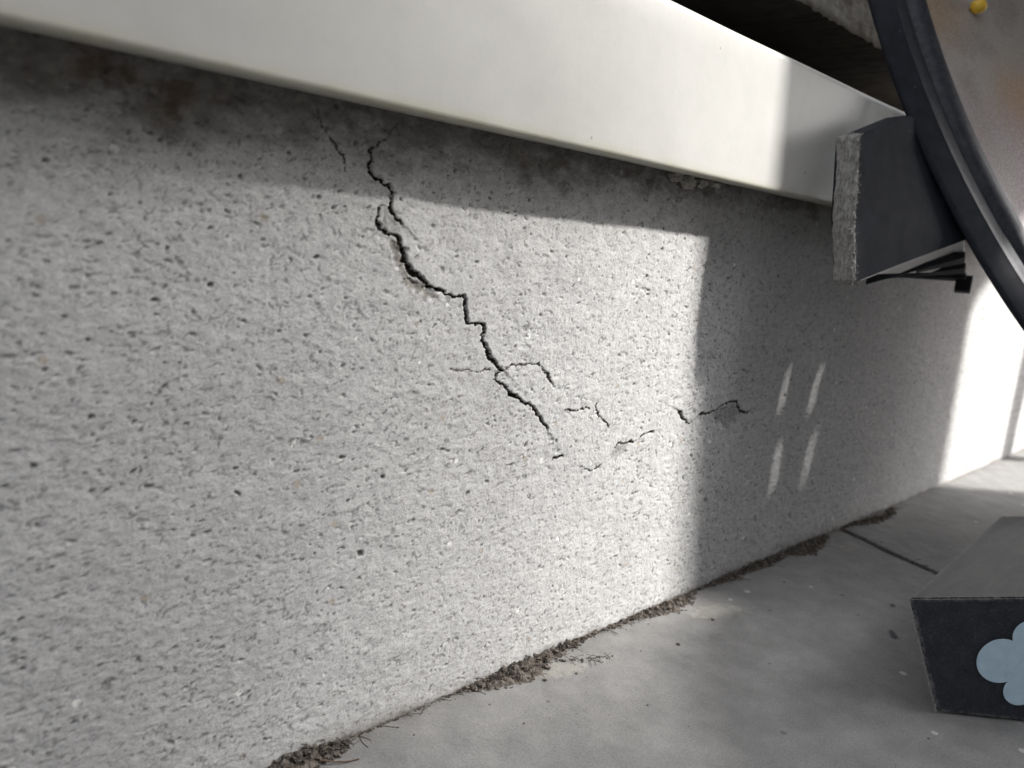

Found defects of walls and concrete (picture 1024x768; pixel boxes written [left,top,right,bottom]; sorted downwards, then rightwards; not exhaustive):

crack [317,110,653,471]
crack [677,400,749,424]